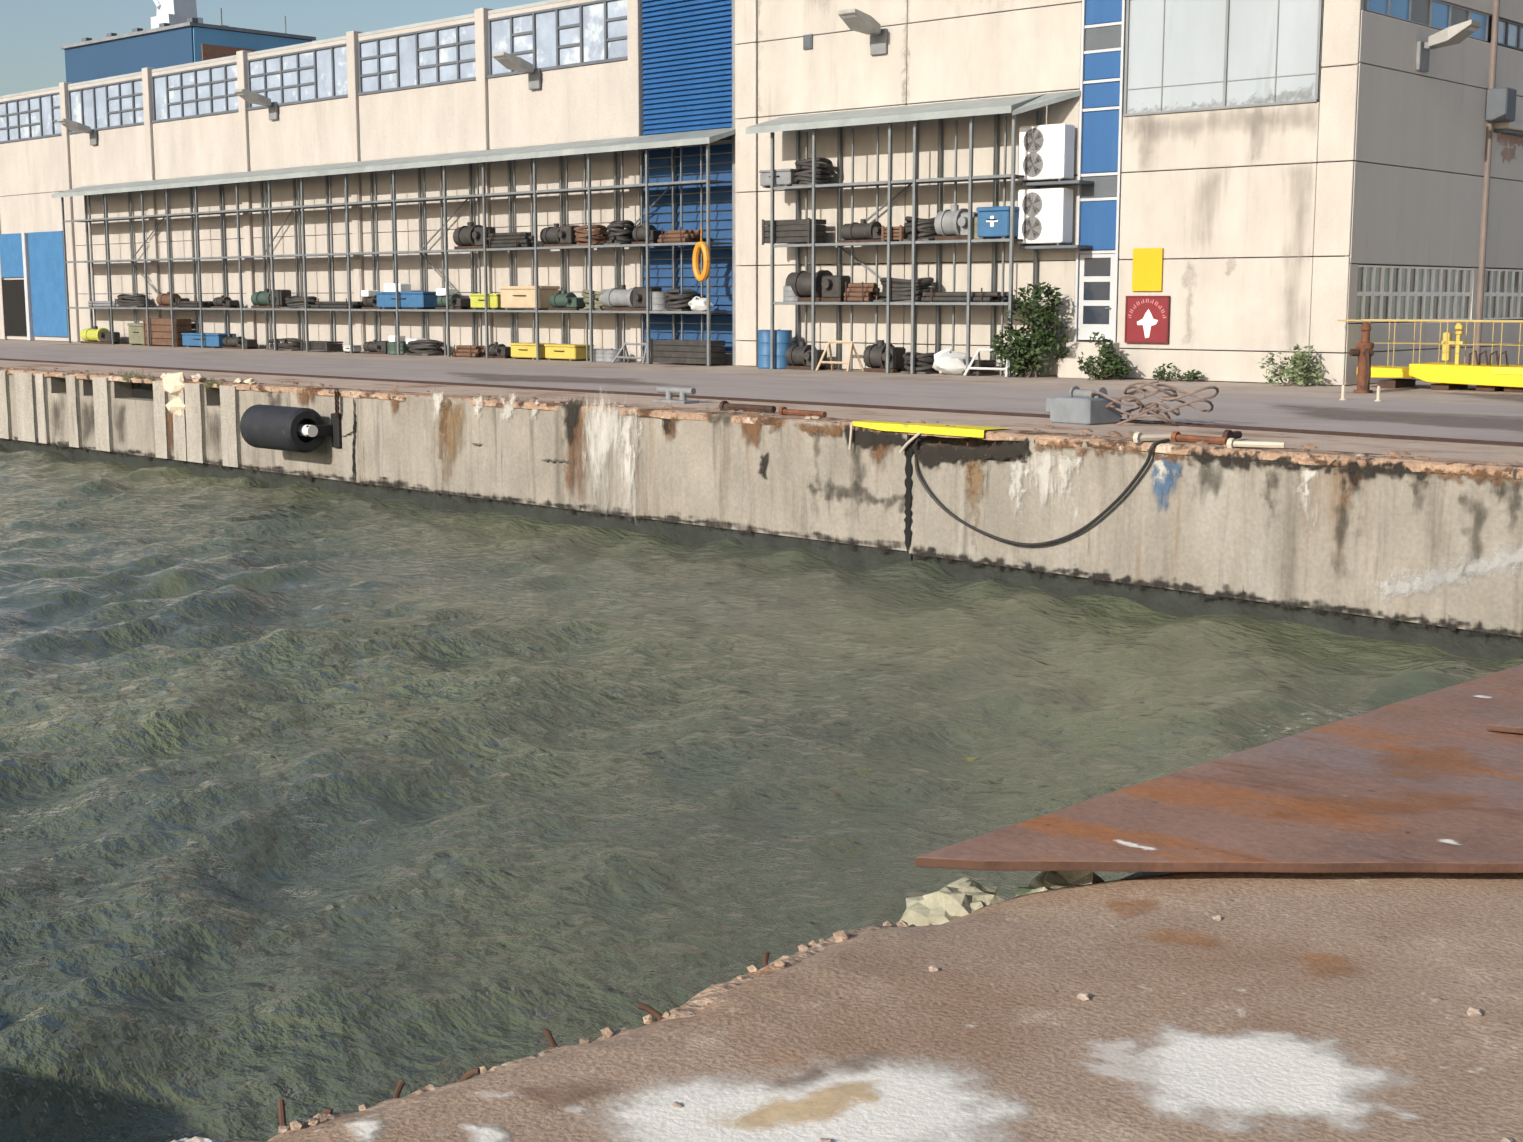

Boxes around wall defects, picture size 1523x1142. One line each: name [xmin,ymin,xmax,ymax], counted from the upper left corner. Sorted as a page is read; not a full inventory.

corrosion [438,401,463,465]
damp [0,400,1523,641]
spalling [266,920,932,1142]